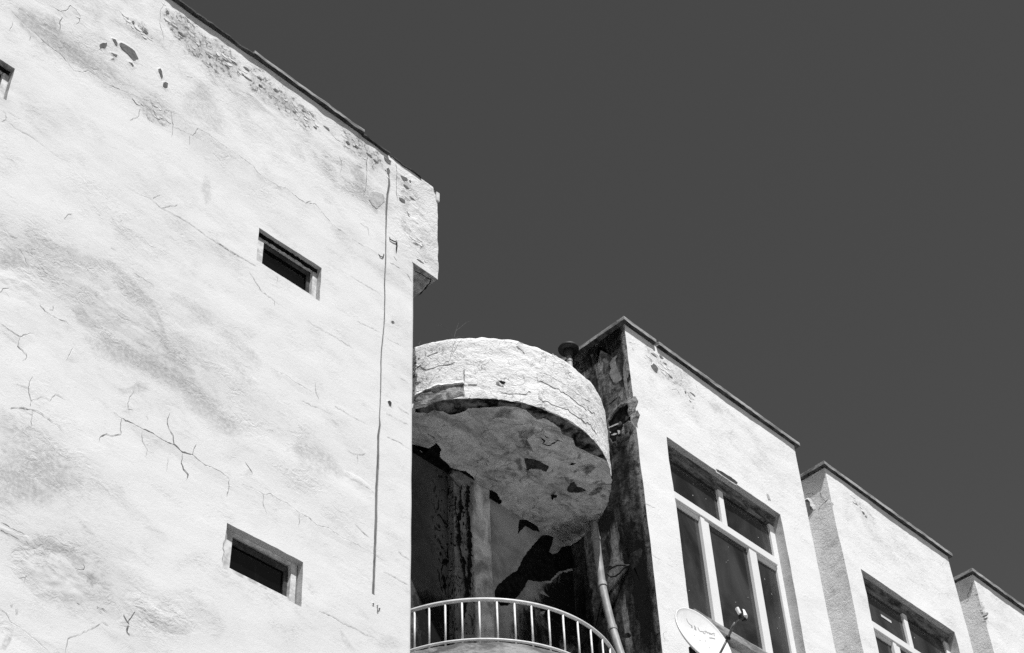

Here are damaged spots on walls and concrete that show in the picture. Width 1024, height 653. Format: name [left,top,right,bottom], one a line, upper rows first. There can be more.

flaking render [97,37,141,70]
flaking render [155,67,170,91]
flaking render [162,2,418,217]
crack [0,5,478,594]
leakage [583,325,623,371]
flaking render [412,354,640,466]
flaking render [412,441,504,505]
flaking render [523,457,550,472]
flaking render [550,480,587,501]
leakage [599,510,615,533]
flaking render [492,518,573,610]
leakage [608,516,657,649]